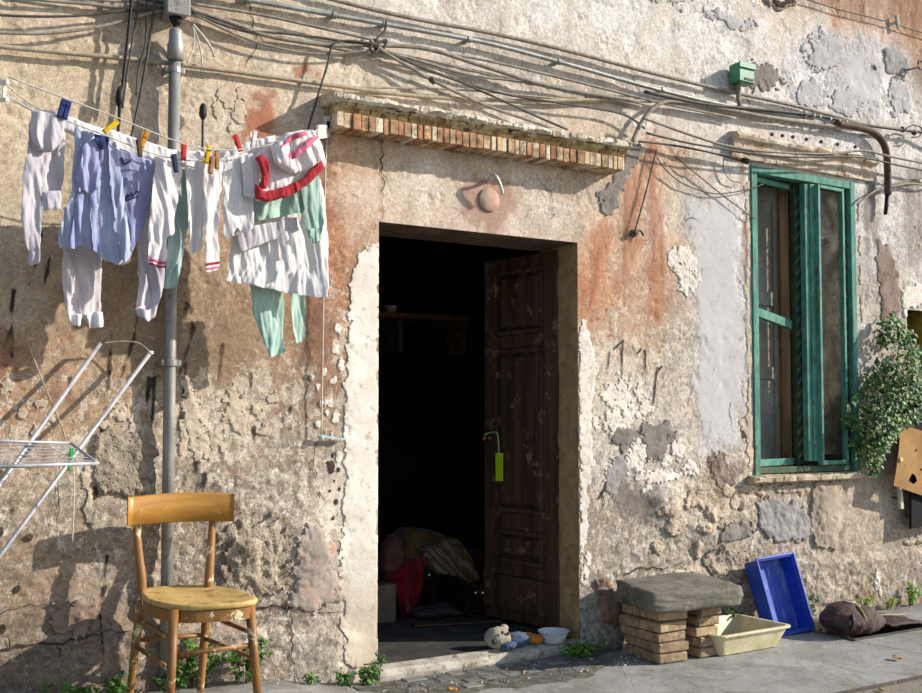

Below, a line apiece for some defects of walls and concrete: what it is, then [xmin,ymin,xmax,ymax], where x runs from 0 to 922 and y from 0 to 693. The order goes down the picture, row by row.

spalling [651,0,759,32]
spalling [750,25,865,118]
spalling [888,76,912,118]
crack [380,140,388,221]
spalling [596,140,642,216]
peeling [667,243,702,298]
peeling [305,243,379,668]
peeling [578,319,738,627]
peeling [904,534,922,546]
peeling [874,568,882,597]